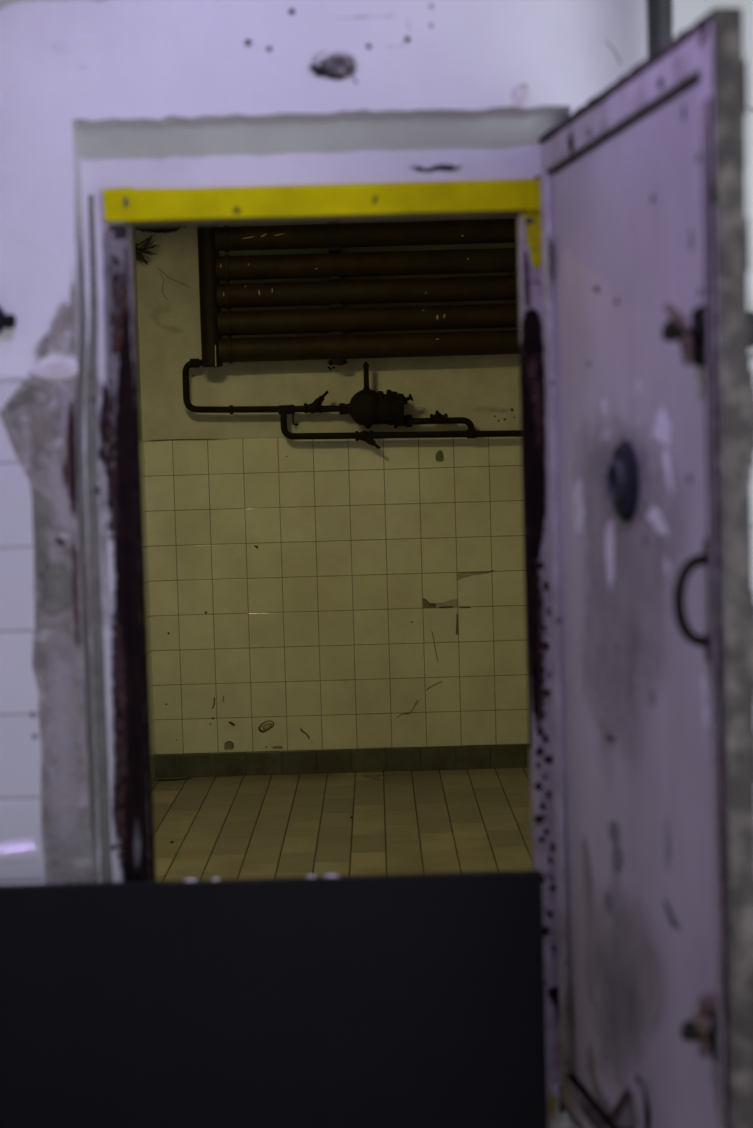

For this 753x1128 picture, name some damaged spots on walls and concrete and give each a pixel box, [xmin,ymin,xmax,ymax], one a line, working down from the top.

peeling [0,361,92,884]
corrosion [93,228,156,882]
corrosion [520,252,572,1032]